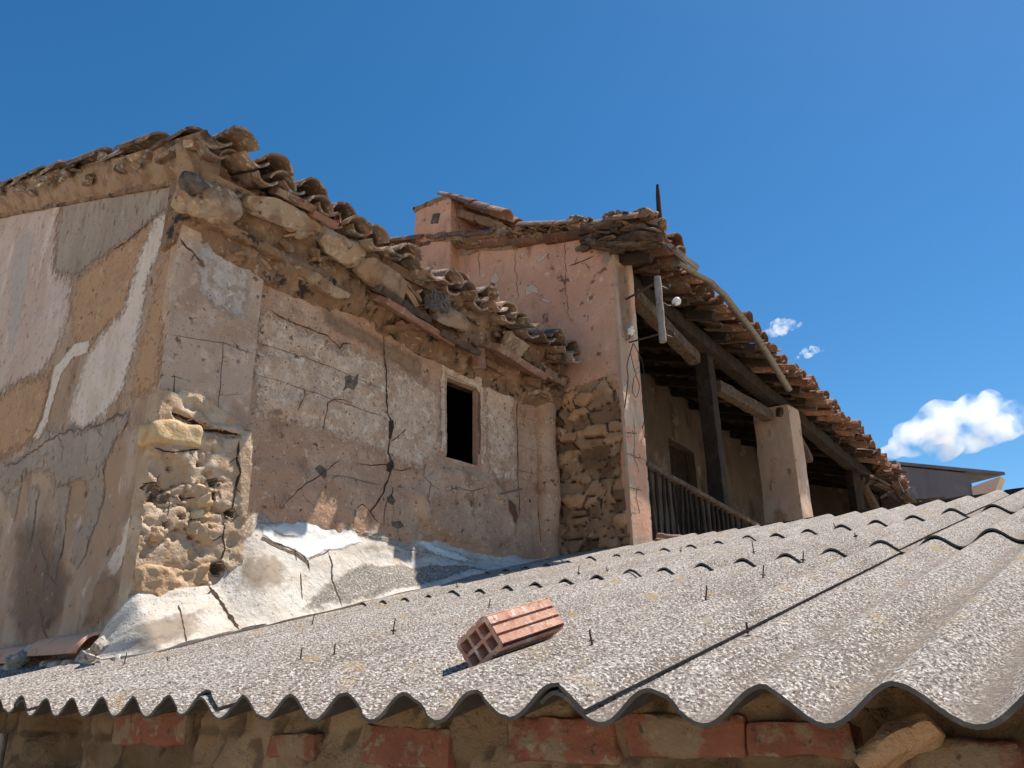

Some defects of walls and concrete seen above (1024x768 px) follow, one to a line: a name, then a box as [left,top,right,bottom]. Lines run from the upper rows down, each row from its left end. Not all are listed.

peeling [0,187,170,460]
crack [142,309,541,561]
spalling [139,484,170,505]
spalling [134,562,211,597]
crack [271,529,342,604]
crack [143,586,265,653]